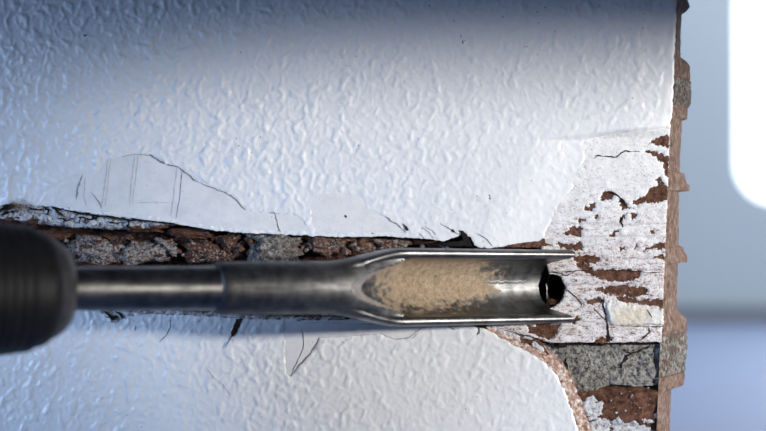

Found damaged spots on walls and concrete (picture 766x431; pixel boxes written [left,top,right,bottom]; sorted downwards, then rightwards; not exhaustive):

spalling [446,229,472,247]
peeling [500,134,669,309]
spalling [486,323,592,431]